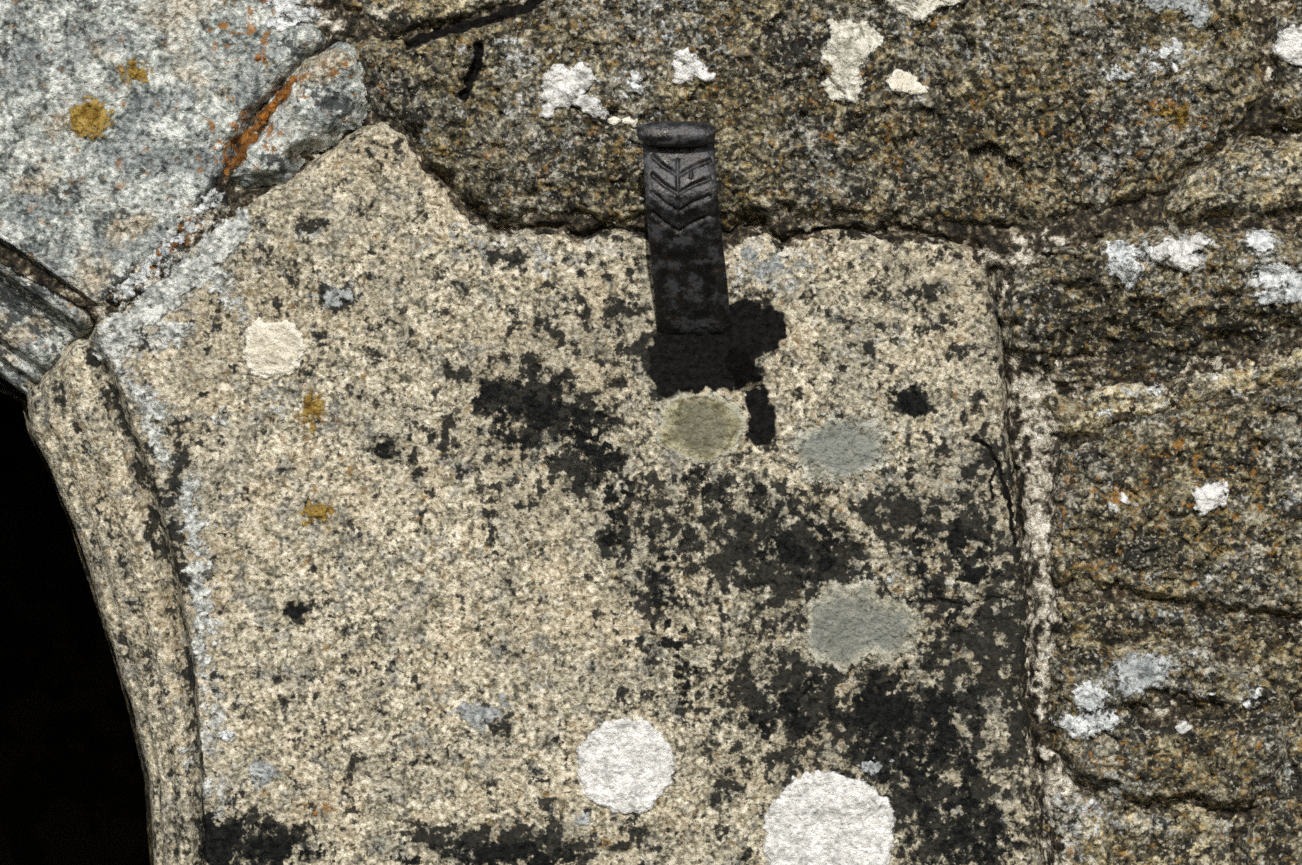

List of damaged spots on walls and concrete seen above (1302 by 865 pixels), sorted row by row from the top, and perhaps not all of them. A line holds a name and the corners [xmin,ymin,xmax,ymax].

crack [972,436,1017,544]